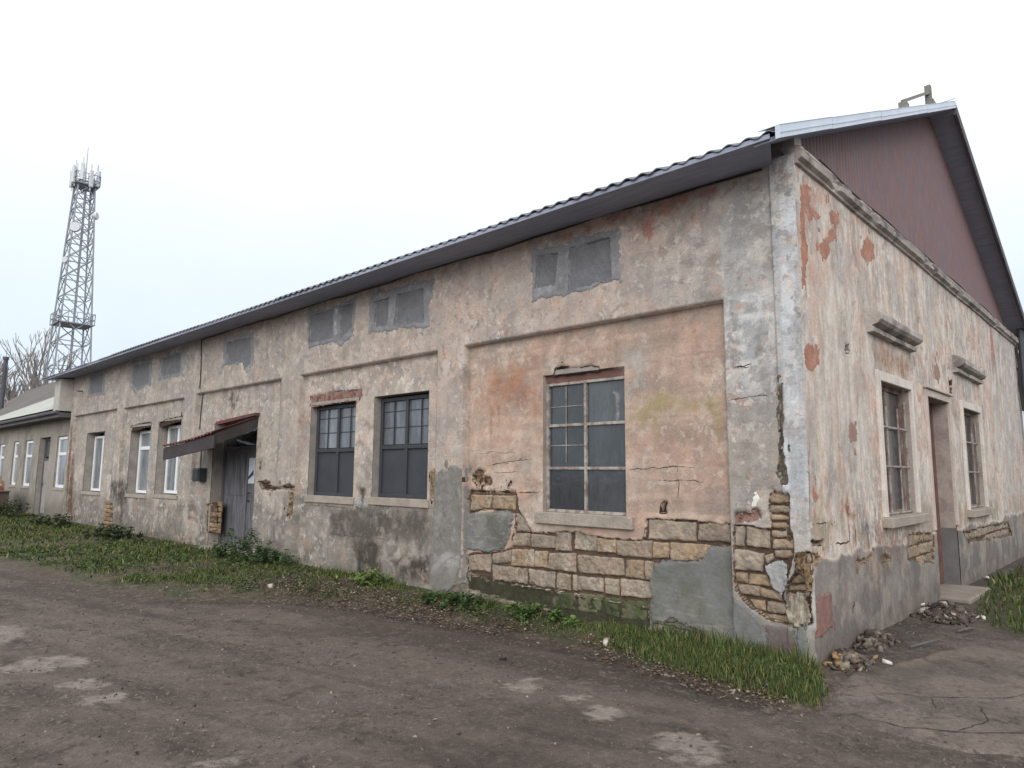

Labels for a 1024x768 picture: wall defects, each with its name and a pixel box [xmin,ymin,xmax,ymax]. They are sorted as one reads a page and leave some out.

peeling [800,184,839,289]
peeling [860,228,875,265]
peeling [804,343,820,372]
flaking render [258,462,295,518]
crack [477,450,538,493]
flaking render [462,375,824,639]
crack [631,465,717,524]
damp [331,491,425,572]
damp [395,558,429,577]
flaking render [907,531,935,564]
flaking render [957,522,1012,544]